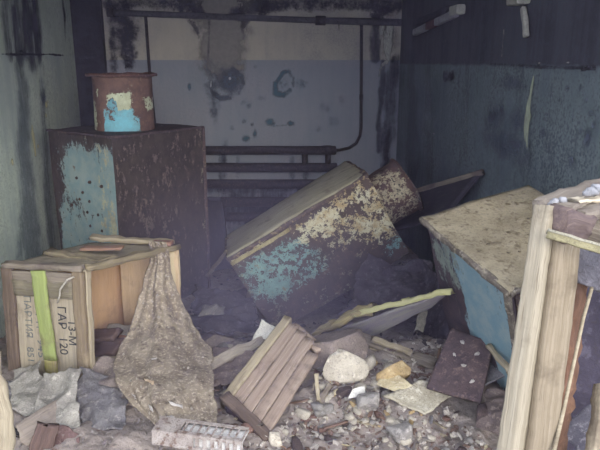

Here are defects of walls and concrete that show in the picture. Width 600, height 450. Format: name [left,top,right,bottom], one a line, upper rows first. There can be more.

leakage [3,0,42,259]
leakage [103,0,402,167]